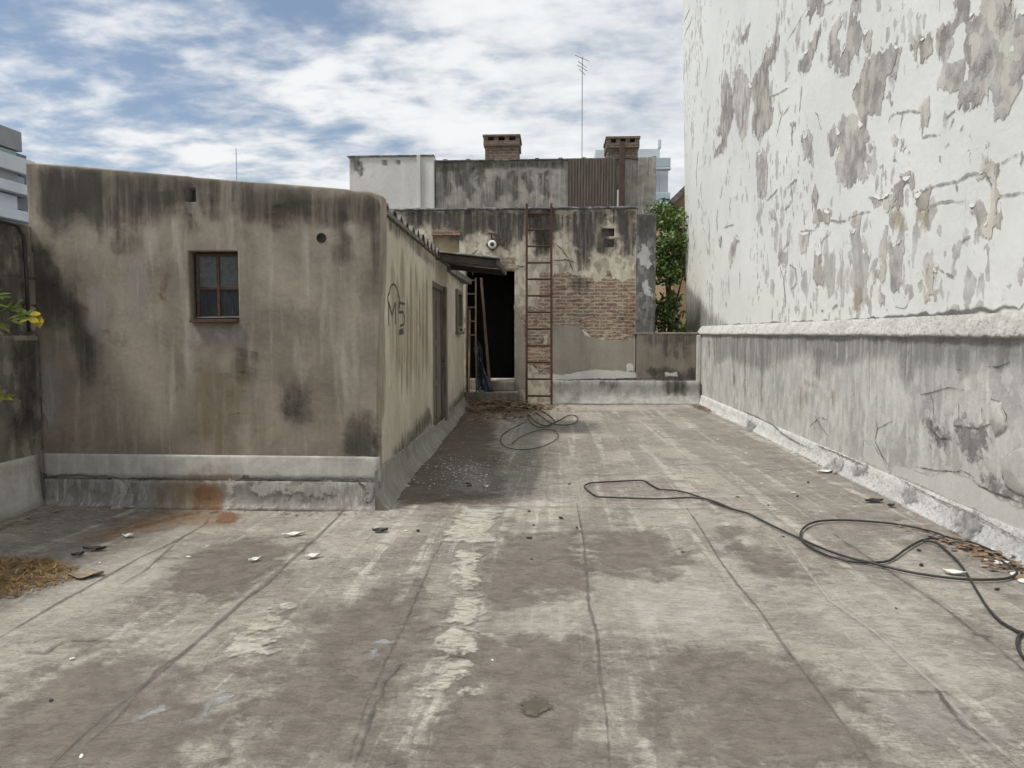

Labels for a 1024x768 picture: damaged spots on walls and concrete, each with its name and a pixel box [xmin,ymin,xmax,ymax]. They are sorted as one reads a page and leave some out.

peeling [714,0,1024,199]
leakage [40,170,191,240]
leakage [232,184,375,258]
leakage [390,162,650,270]
peeling [798,184,907,315]
peeling [891,170,931,225]
peeling [969,141,1023,239]
flaking render [524,244,654,374]
leakage [14,340,59,431]
crack [921,387,990,440]
crack [747,413,1023,541]
leakage [469,530,701,611]